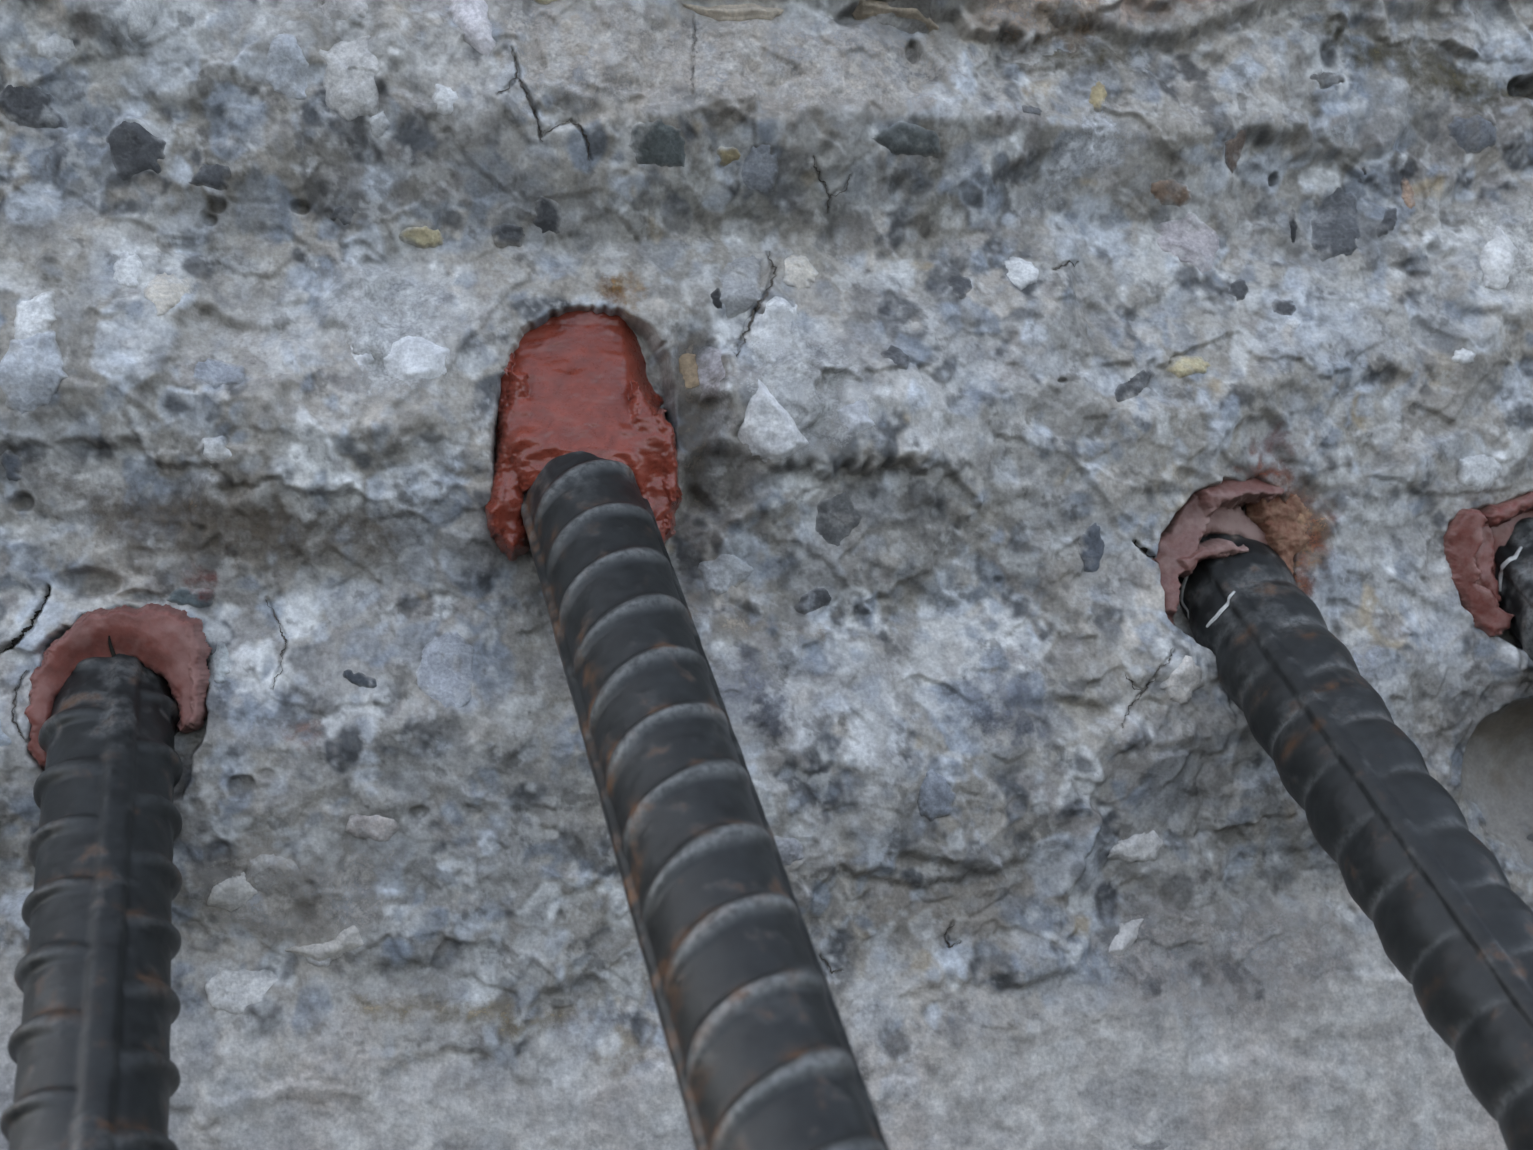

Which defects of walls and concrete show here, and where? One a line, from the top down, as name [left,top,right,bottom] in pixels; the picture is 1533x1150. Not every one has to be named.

rust [1252,433,1333,593]